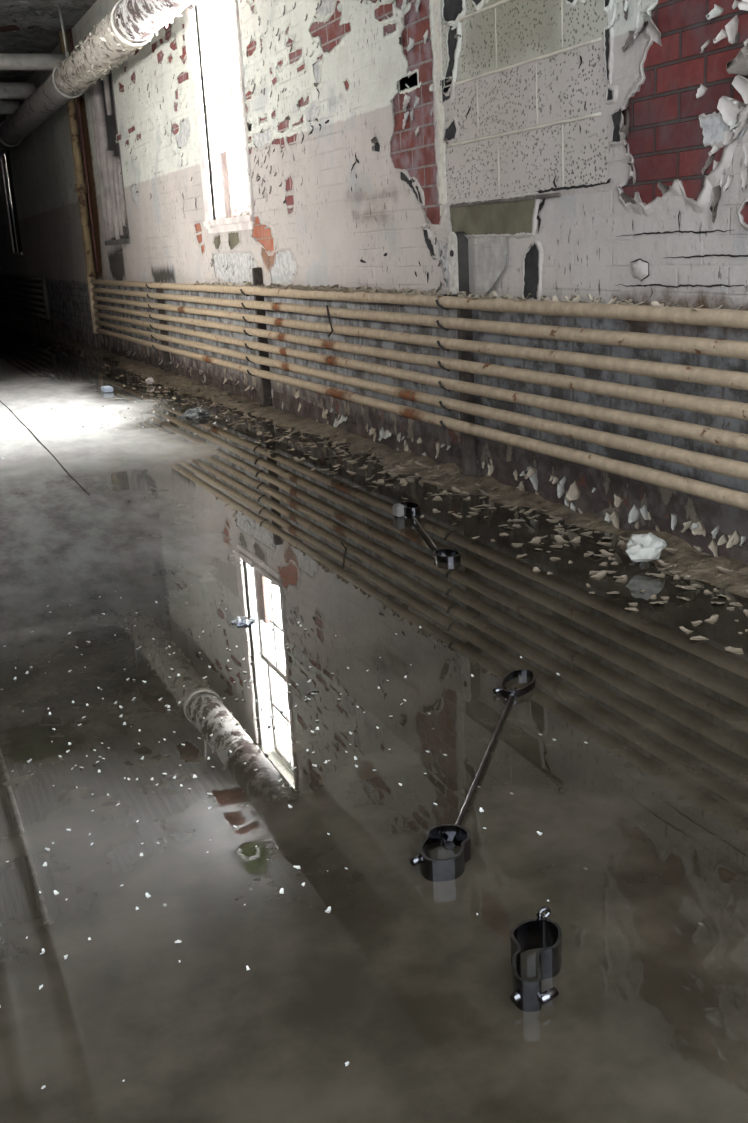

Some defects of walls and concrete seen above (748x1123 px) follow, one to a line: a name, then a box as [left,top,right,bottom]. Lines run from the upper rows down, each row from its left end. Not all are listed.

peeling [56,0,198,208]
peeling [194,0,748,311]